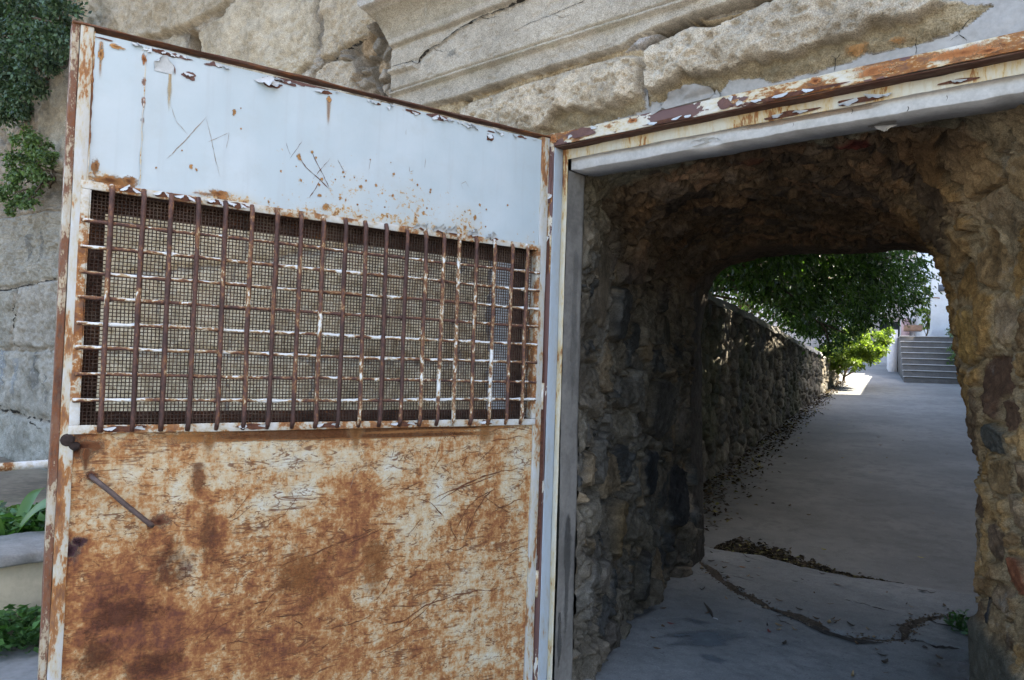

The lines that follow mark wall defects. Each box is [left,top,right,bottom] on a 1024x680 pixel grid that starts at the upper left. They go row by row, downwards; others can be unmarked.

crack [388,0,584,69]
rust [98,41,124,71]
peeling [132,23,230,81]
peeling [255,76,338,95]
spalling [339,0,994,141]
rust [928,40,1012,62]
rust [90,159,138,188]
rust [194,190,229,199]
rust [129,425,519,449]
rust [193,462,205,492]
rust [67,537,88,558]
crack [699,554,959,649]